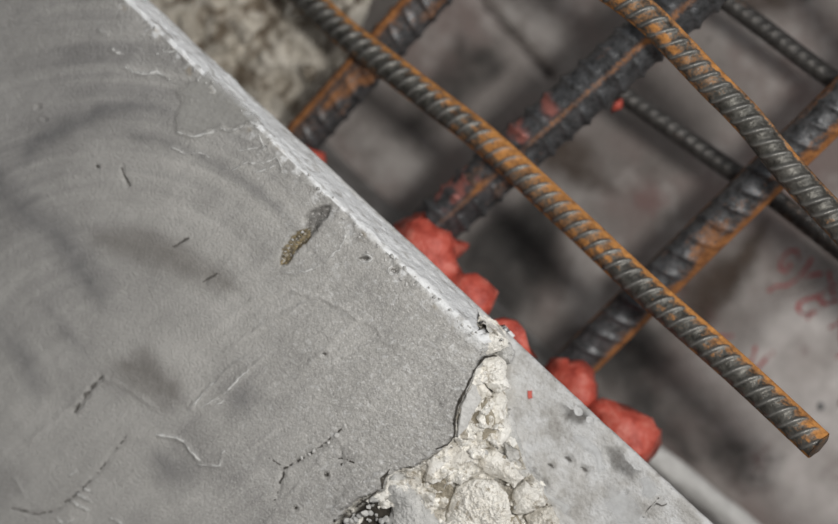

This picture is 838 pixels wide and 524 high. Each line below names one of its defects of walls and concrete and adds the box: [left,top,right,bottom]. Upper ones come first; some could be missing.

spalling [150,0,838,458]
crack [333,469,390,522]
spalling [334,315,559,524]
crack [436,355,497,449]